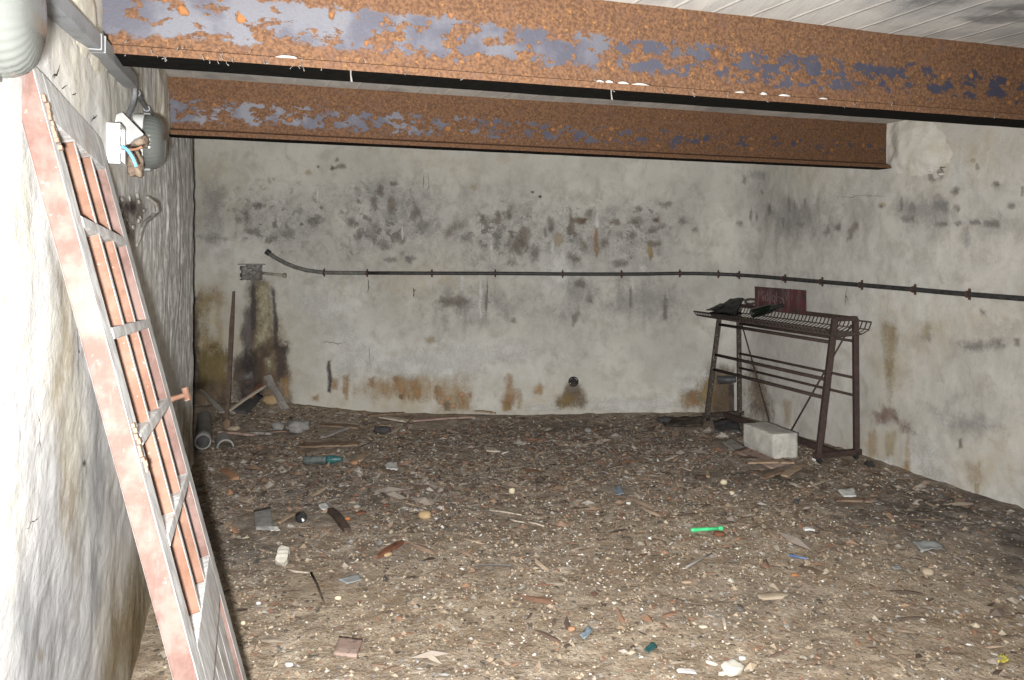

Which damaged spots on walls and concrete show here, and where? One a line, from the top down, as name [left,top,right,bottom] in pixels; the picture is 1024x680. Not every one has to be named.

leakage [481,200,605,285]
leakage [612,202,670,271]
leakage [234,282,291,403]
leakage [327,348,370,392]
leakage [528,385,677,413]
leakage [681,367,734,412]